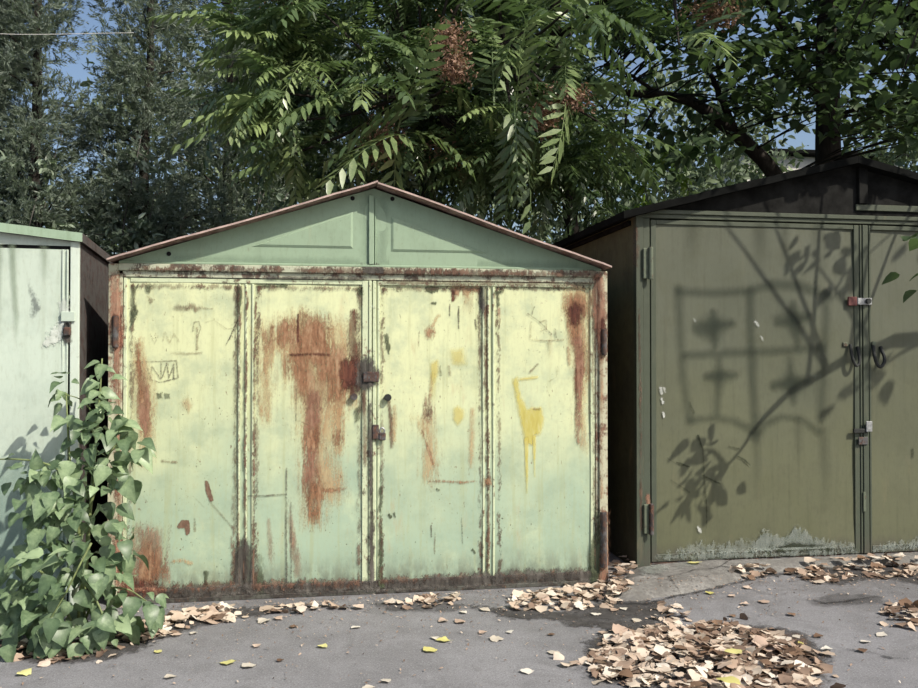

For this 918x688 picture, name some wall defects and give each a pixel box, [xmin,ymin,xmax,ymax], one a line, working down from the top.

corrosion [109,263,610,597]
peeling [776,543,832,552]